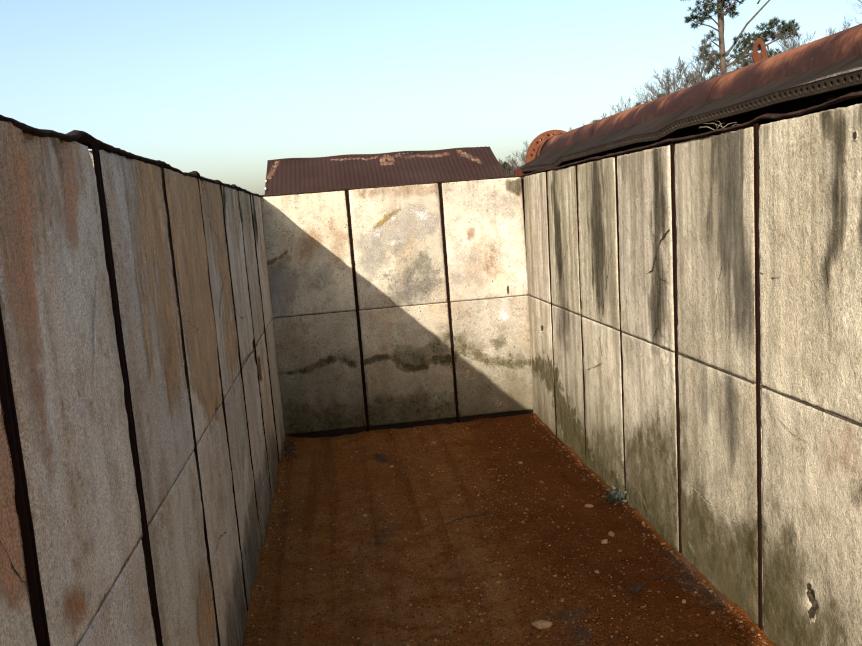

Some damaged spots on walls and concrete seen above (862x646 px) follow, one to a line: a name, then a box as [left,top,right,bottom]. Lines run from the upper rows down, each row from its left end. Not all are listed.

corrosion [0,122,46,369]
corrosion [58,140,82,241]
corrosion [133,160,238,428]
water stain [588,159,607,310]
crack [626,229,670,351]
water stain [650,148,665,341]
water stain [709,129,755,340]
water stain [821,110,846,279]
corrosion [0,416,25,602]
spalling [805,576,819,625]